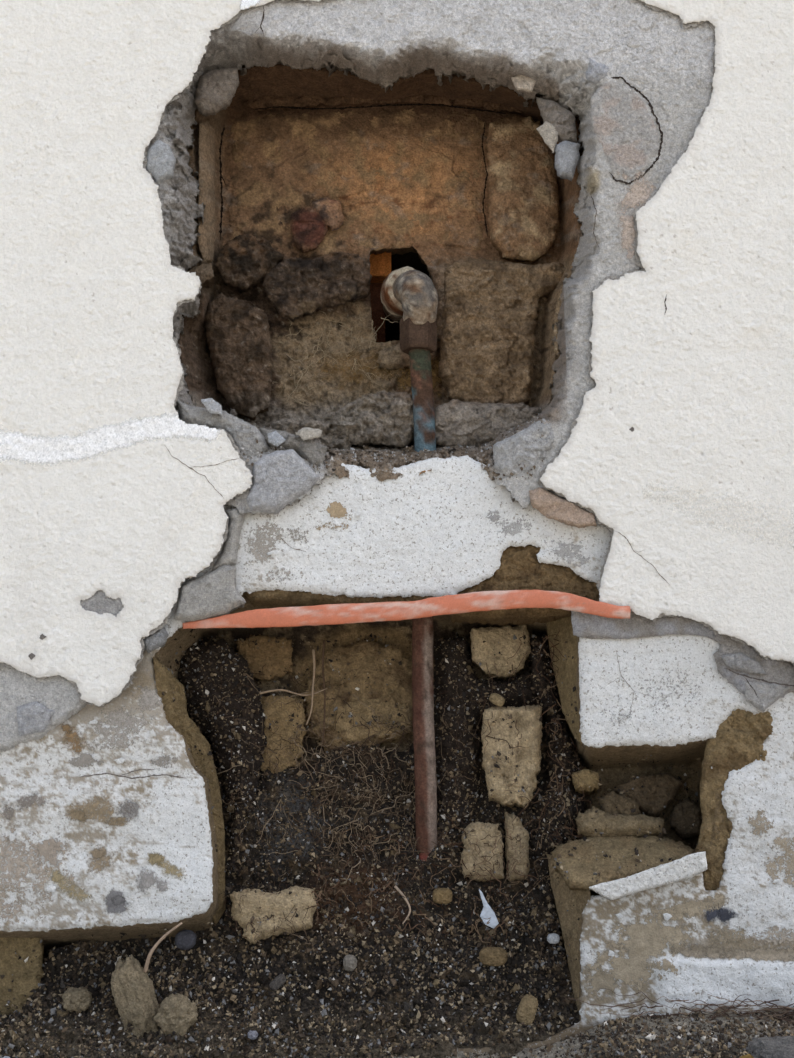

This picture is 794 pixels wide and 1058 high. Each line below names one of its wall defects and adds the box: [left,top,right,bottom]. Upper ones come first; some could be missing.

spalling [146,0,715,622]
crack [609,77,663,185]
spalling [0,619,413,1015]
spalling [433,608,794,1037]